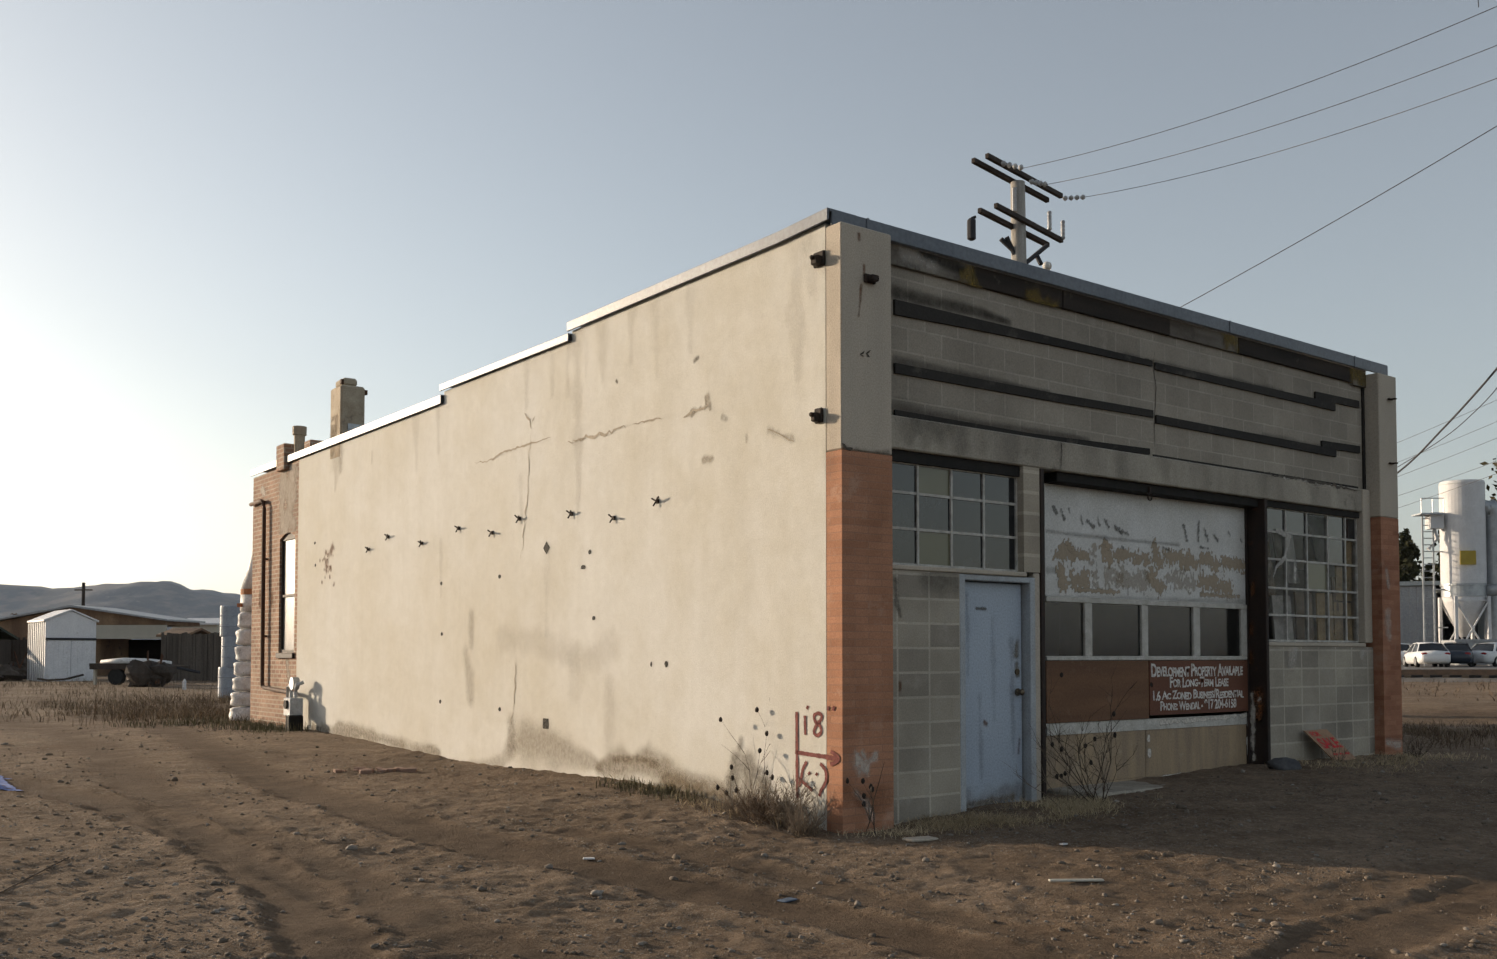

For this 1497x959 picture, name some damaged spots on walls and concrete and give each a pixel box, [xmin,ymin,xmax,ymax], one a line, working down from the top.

water stain [921,252,964,274]
crack [475,404,708,557]
peeling [1052,506,1255,599]